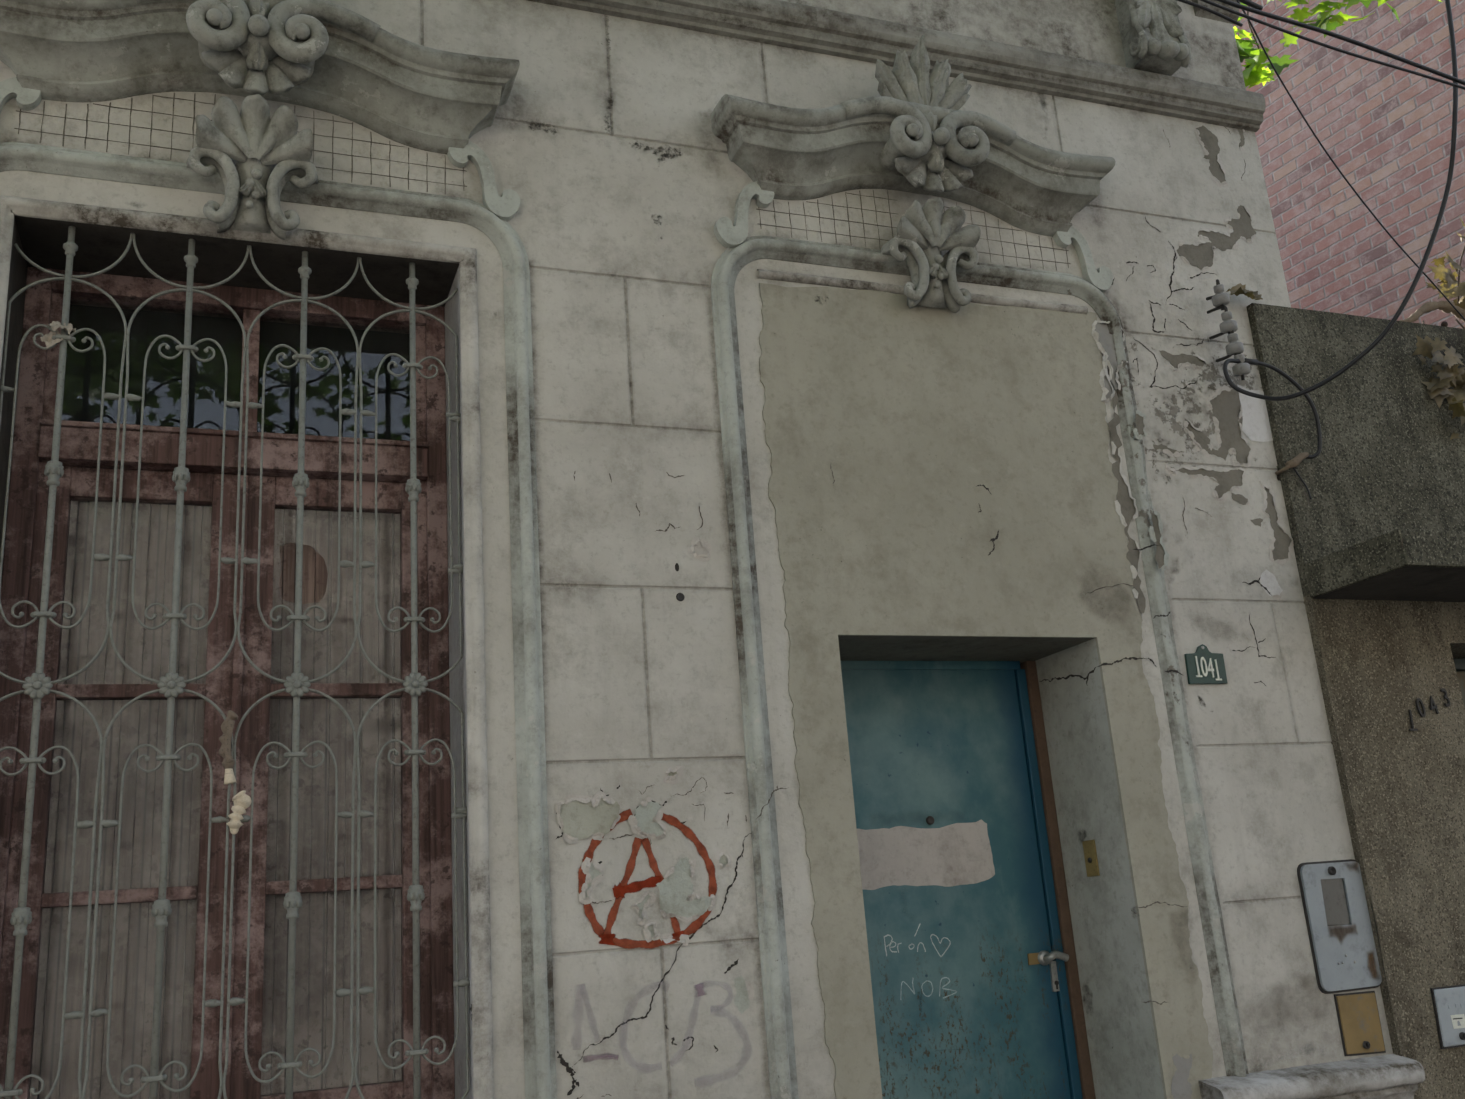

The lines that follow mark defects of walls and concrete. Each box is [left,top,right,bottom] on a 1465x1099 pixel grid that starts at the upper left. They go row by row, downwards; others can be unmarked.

peeling [1194,125,1229,187]
peeling [1177,205,1256,272]
crack [1112,214,1215,389]
peeling [1092,320,1294,614]
crack [1039,657,1182,686]
crack [1232,578,1276,686]
peeling [628,797,667,840]
peeling [579,857,605,905]
crack [557,777,787,1099]
peeling [631,857,717,946]